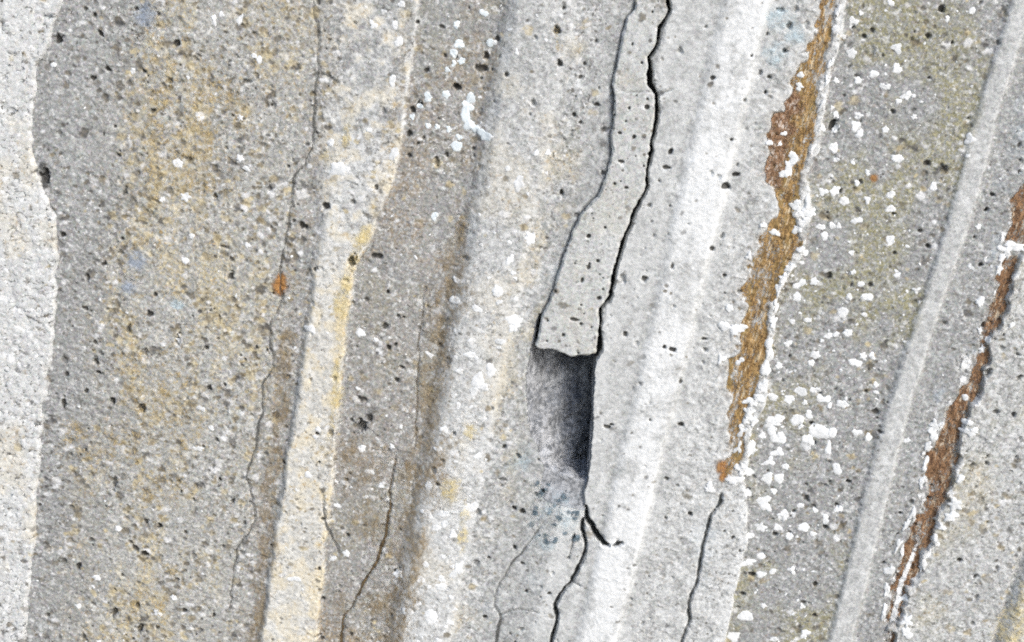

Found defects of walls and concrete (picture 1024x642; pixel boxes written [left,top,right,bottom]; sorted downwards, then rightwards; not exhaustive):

crack [594,0,670,357]
rust [717,0,837,482]
rust [1006,184,1024,244]
spalling [526,313,596,510]
rust [885,256,1018,642]
crack [494,505,622,642]
crack [681,494,722,642]